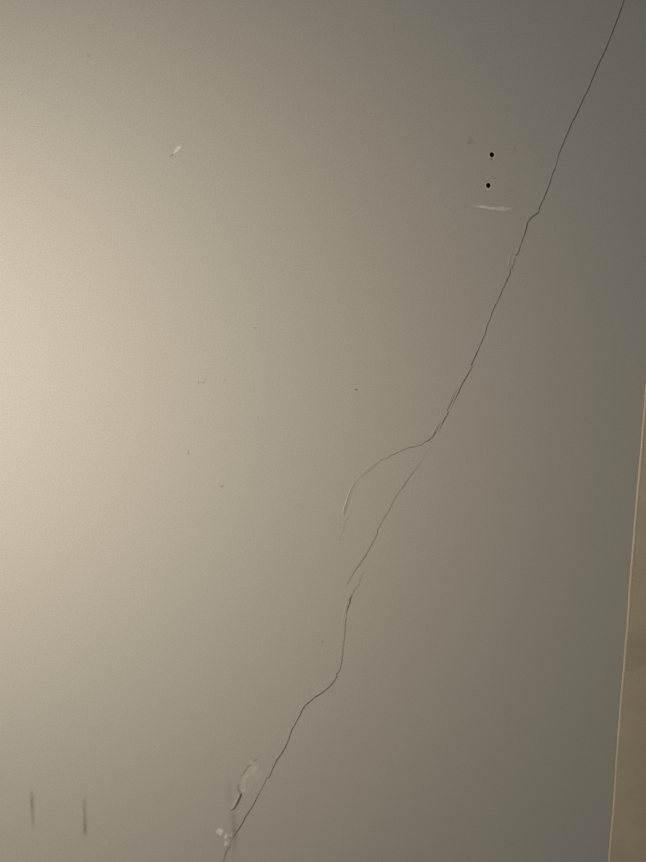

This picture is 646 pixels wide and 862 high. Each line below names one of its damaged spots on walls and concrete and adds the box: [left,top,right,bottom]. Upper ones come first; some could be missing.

crack [222,0,625,862]